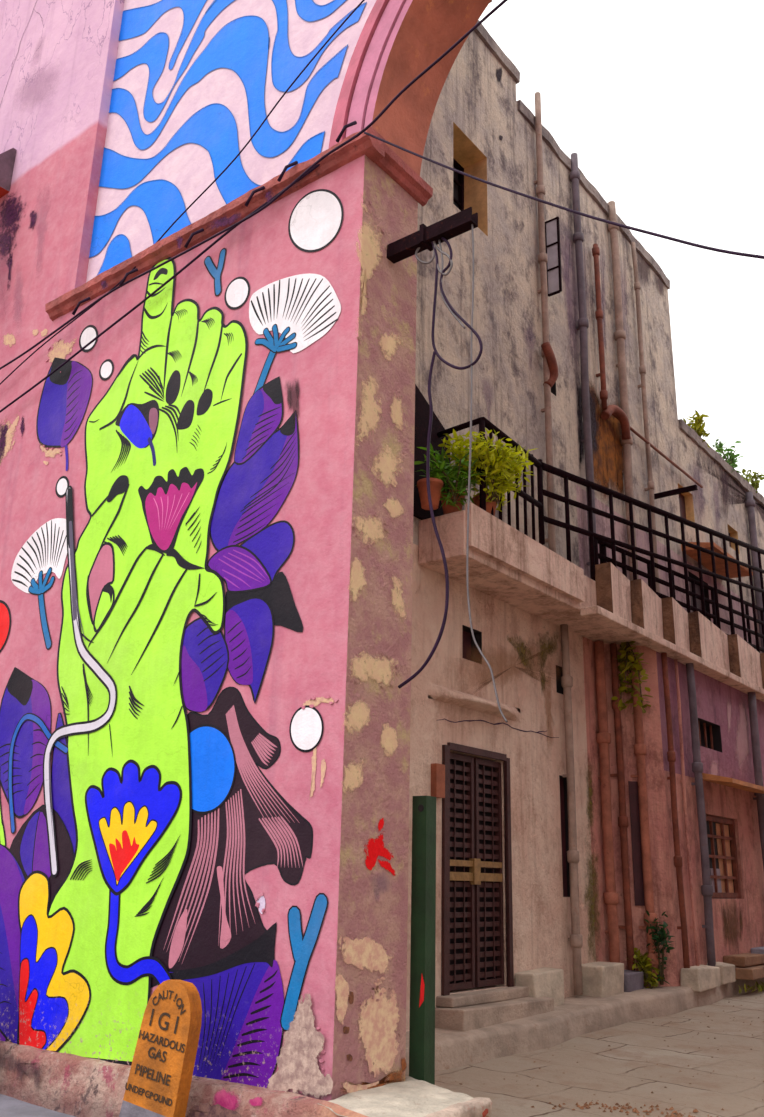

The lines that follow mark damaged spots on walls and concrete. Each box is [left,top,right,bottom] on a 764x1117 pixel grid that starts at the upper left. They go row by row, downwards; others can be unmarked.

mould [0,194,37,289]
peeling [356,200,384,319]
peeling [379,333,400,360]
peeling [0,410,24,464]
peeling [357,377,403,439]
rust [590,390,624,495]
peeling [352,445,404,549]
peeling [348,558,367,601]
peeling [352,651,399,689]
peeling [302,695,370,732]
peeling [381,724,398,756]
peeling [267,934,402,1098]